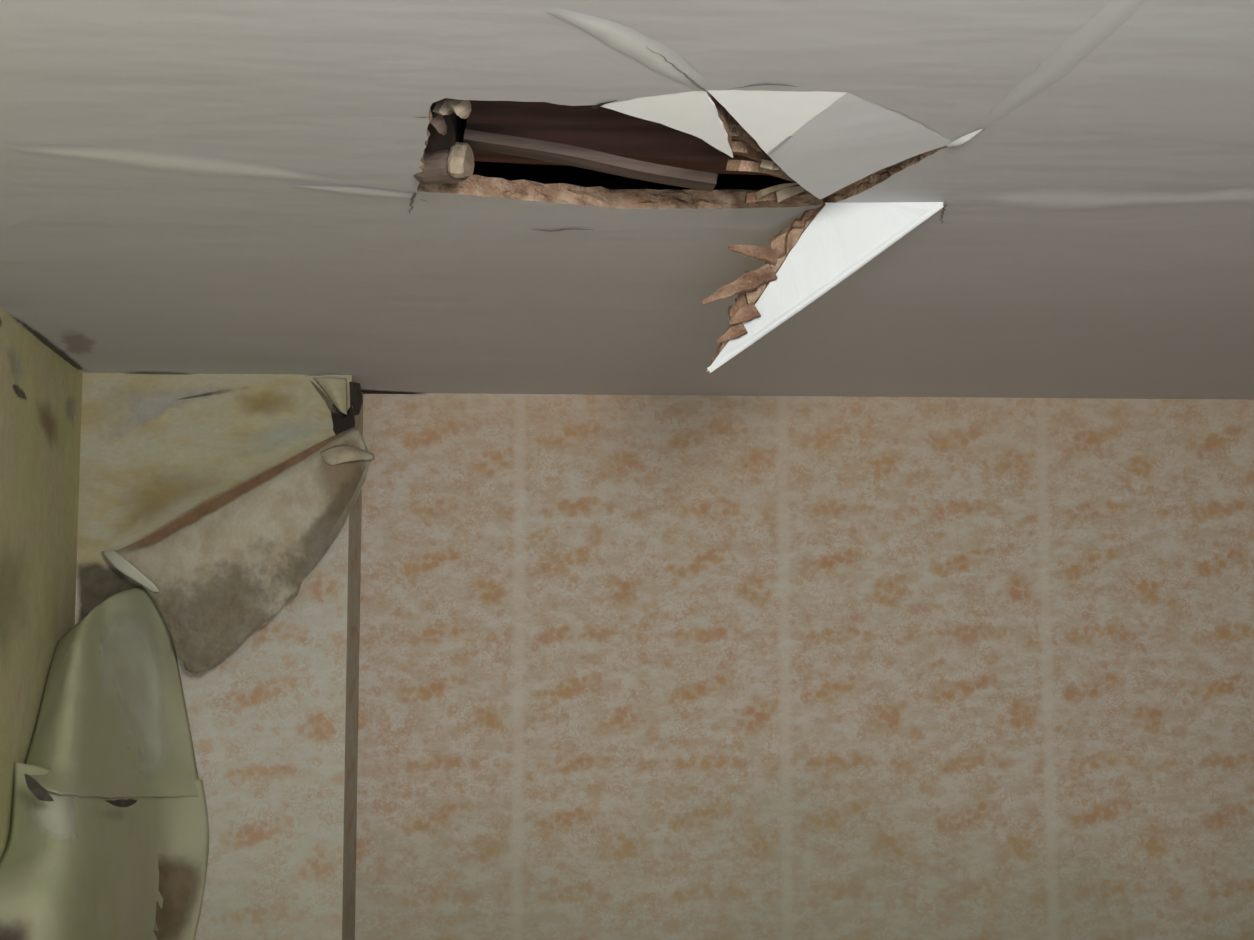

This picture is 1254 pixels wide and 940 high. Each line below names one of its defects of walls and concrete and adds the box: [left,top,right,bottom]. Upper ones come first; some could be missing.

spalling [417,108,947,209]
flaking render [76,373,353,577]